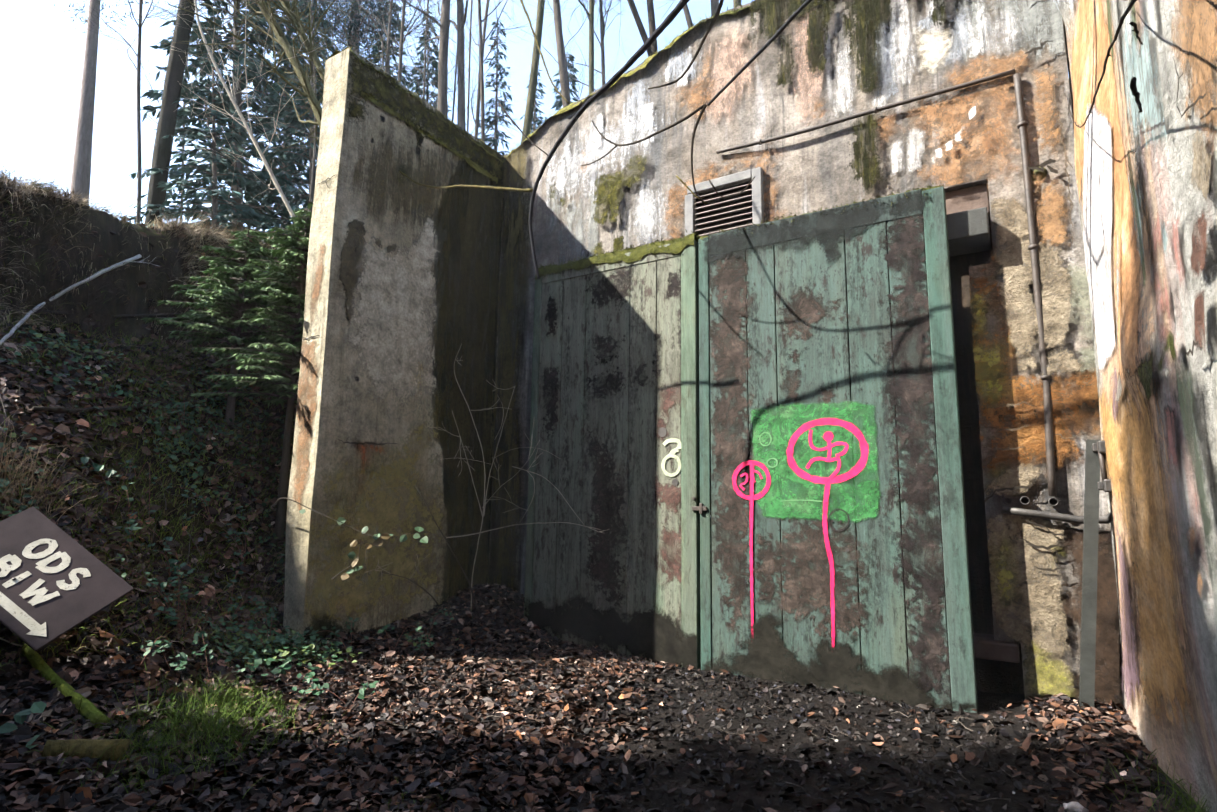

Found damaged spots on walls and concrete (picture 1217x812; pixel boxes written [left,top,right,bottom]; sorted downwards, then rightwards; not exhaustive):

damp [665,49,701,86]
damp [834,48,853,112]
damp [546,78,672,265]
damp [891,128,939,173]
damp [339,159,503,602]